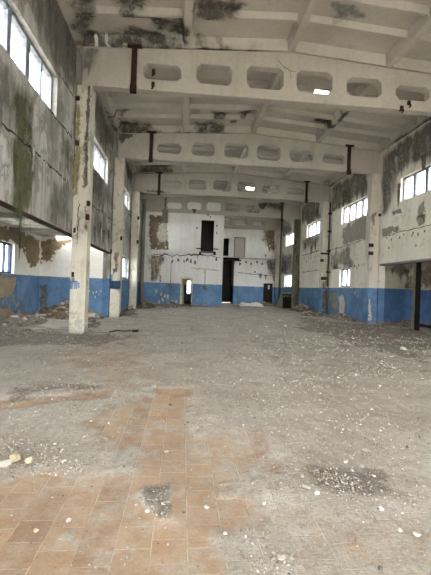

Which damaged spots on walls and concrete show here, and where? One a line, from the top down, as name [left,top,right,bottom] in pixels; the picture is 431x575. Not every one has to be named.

leakage [33,0,190,81]
leakage [178,111,226,134]
leakage [0,68,32,253]
crack [2,123,71,184]
leakage [382,116,431,213]
leakage [324,174,368,212]
flaking render [0,226,72,268]
flaking render [147,212,169,250]
crack [154,253,219,273]
peeling [342,215,366,247]
peeling [411,202,427,237]
peeling [0,275,23,320]